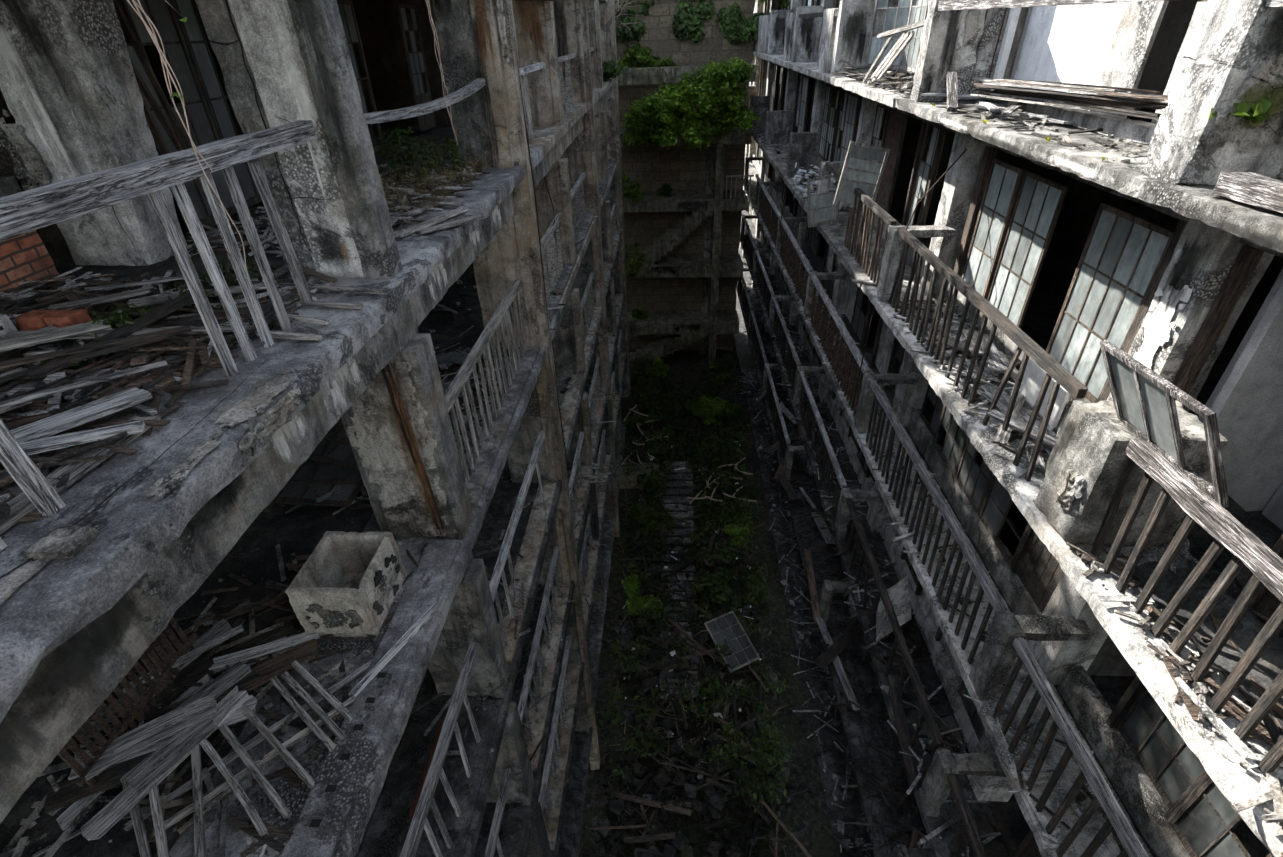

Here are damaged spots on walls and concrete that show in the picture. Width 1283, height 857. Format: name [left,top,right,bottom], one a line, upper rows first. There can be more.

damp [0,0,66,90]
damp [1261,9,1283,58]
damp [21,91,69,162]
peeling [1133,285,1193,369]
spalling [140,368,311,497]
rust [389,380,434,510]
damp [0,595,141,767]